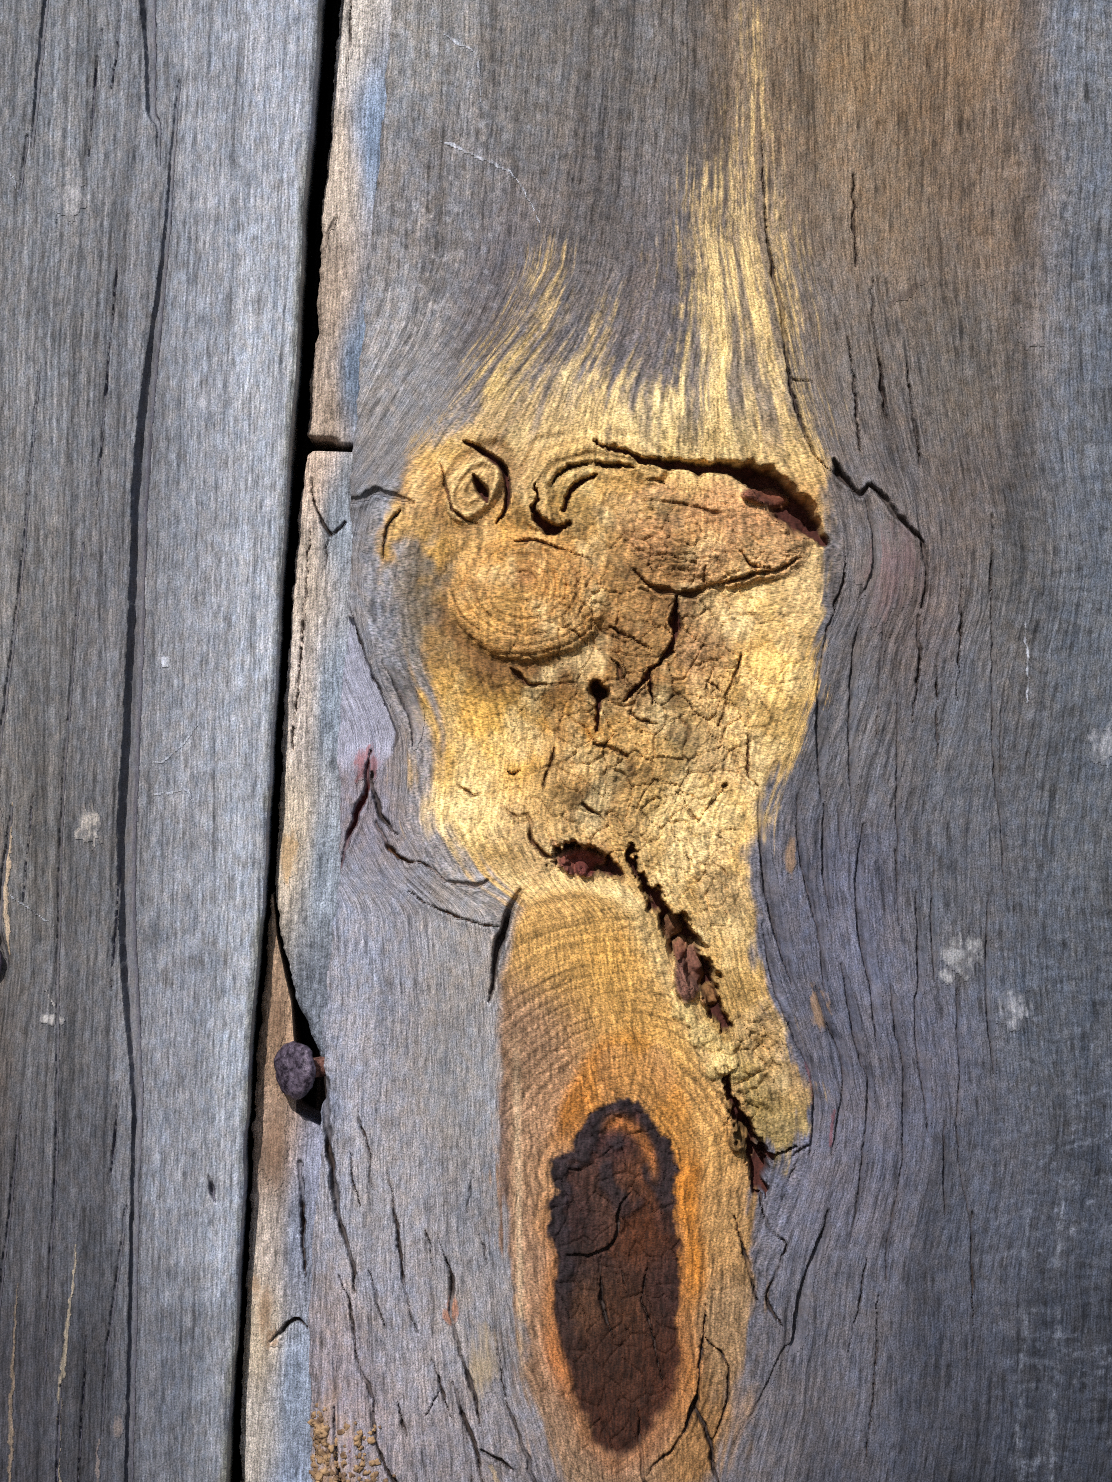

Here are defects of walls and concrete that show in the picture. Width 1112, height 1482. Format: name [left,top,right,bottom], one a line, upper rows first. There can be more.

crack [344,0,352,77]
crack [0,0,181,1482]
crack [291,465,475,748]
crack [340,610,522,1002]
crack [458,748,555,860]
crack [511,668,575,687]
crack [514,539,591,559]
crack [581,803,602,818]
crack [593,626,654,758]
crack [634,135,1008,1482]
crack [271,1076,556,1482]
crack [574,1192,663,1379]